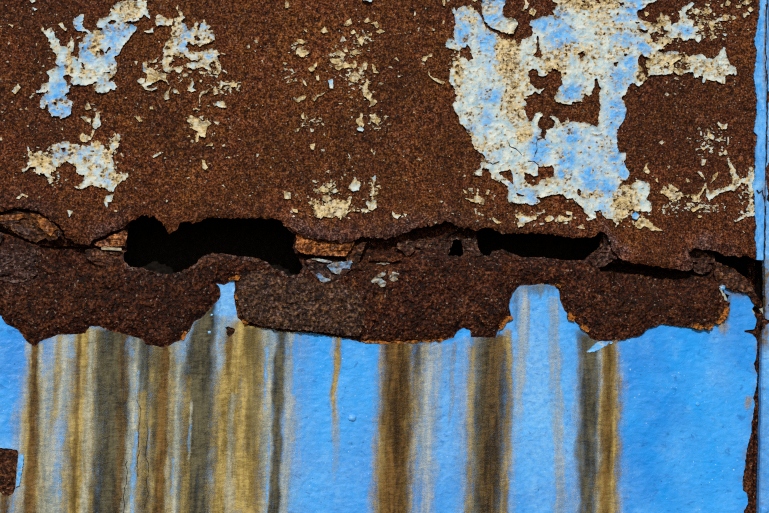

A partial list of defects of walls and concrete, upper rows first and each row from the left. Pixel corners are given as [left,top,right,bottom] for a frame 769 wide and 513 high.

peeling [296,28,309,57]
peeling [36,0,237,146]
peeling [296,63,333,103]
peeling [330,18,385,131]
peeling [428,0,769,260]
peeling [22,102,129,208]
peeling [309,176,381,220]
crack [0,230,102,250]
crack [294,253,345,261]
crack [369,259,402,267]
crack [599,262,712,280]
rust [0,208,763,513]